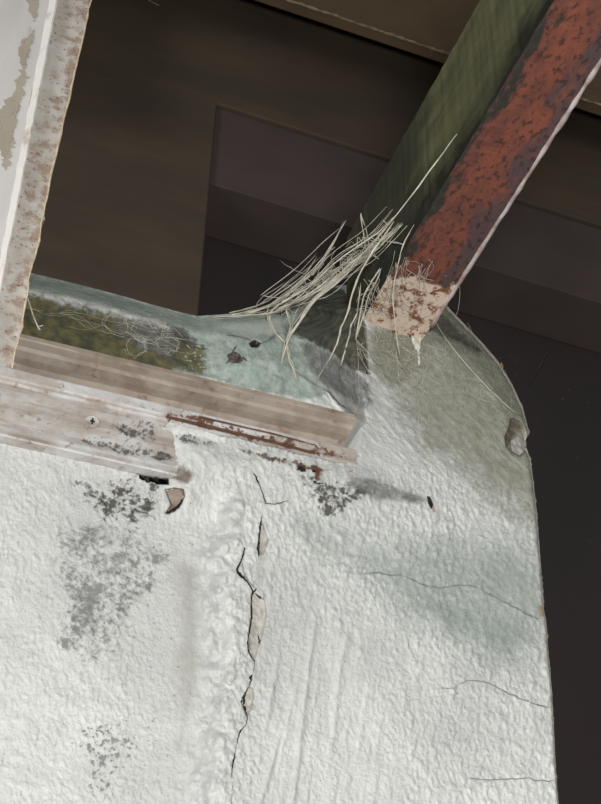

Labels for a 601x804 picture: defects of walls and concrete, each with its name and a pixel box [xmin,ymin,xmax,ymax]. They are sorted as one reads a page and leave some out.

peeling [0,0,39,170]
rust [166,413,345,480]
water stain [301,476,421,516]
water stain [61,468,191,650]
crack [364,572,539,619]
crack [231,473,286,804]
crack [447,680,548,708]
crack [471,775,553,783]